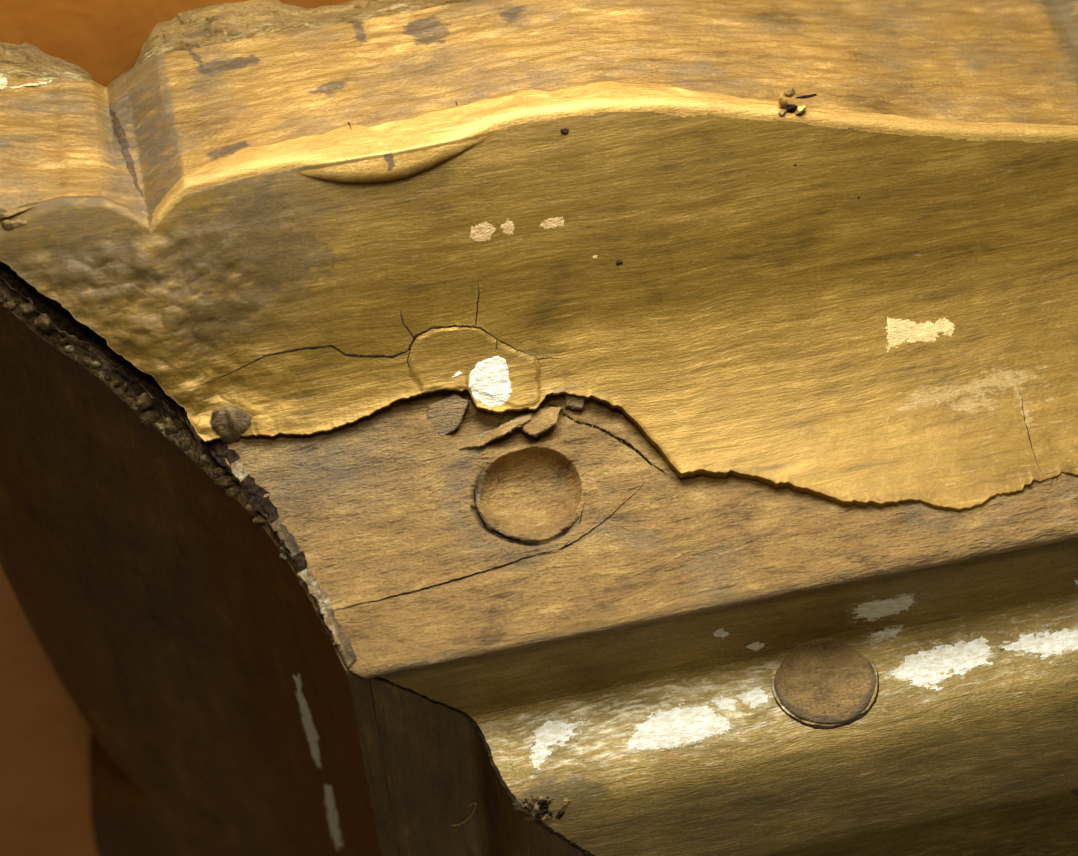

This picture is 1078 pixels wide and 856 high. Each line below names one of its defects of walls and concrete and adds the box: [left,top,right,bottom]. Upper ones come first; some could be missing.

spalling [0,207,27,230]
peeling [885,317,955,352]
peeling [224,356,1078,679]
crack [0,261,674,856]
peeling [880,624,1078,697]
peeling [293,674,321,769]
peeling [527,716,587,770]
peeling [620,684,774,762]
peeling [324,784,343,851]